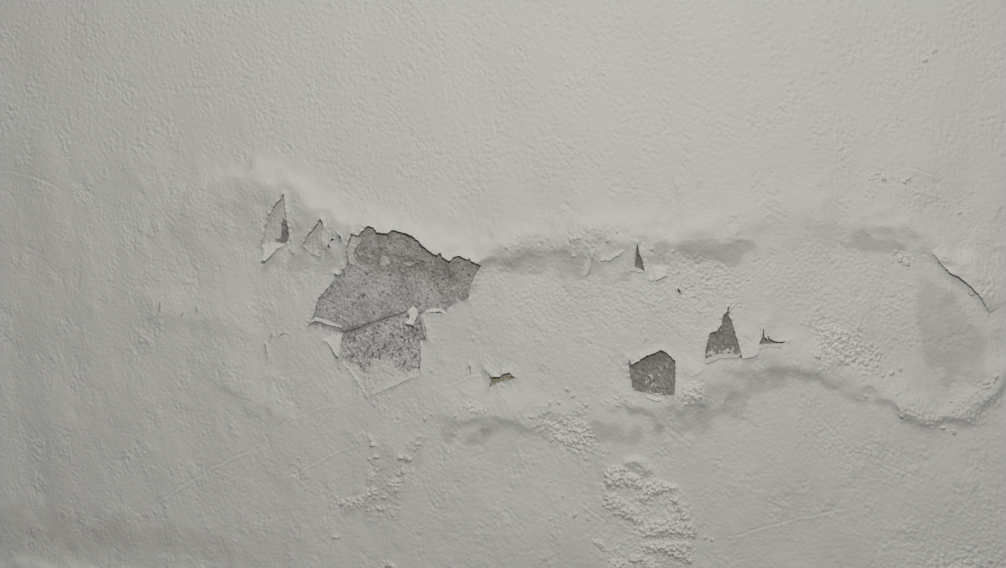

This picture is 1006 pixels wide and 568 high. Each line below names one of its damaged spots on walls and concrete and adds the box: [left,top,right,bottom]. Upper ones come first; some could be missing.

peeling [256,188,490,405]
peeling [479,362,525,397]
peeling [610,298,794,409]